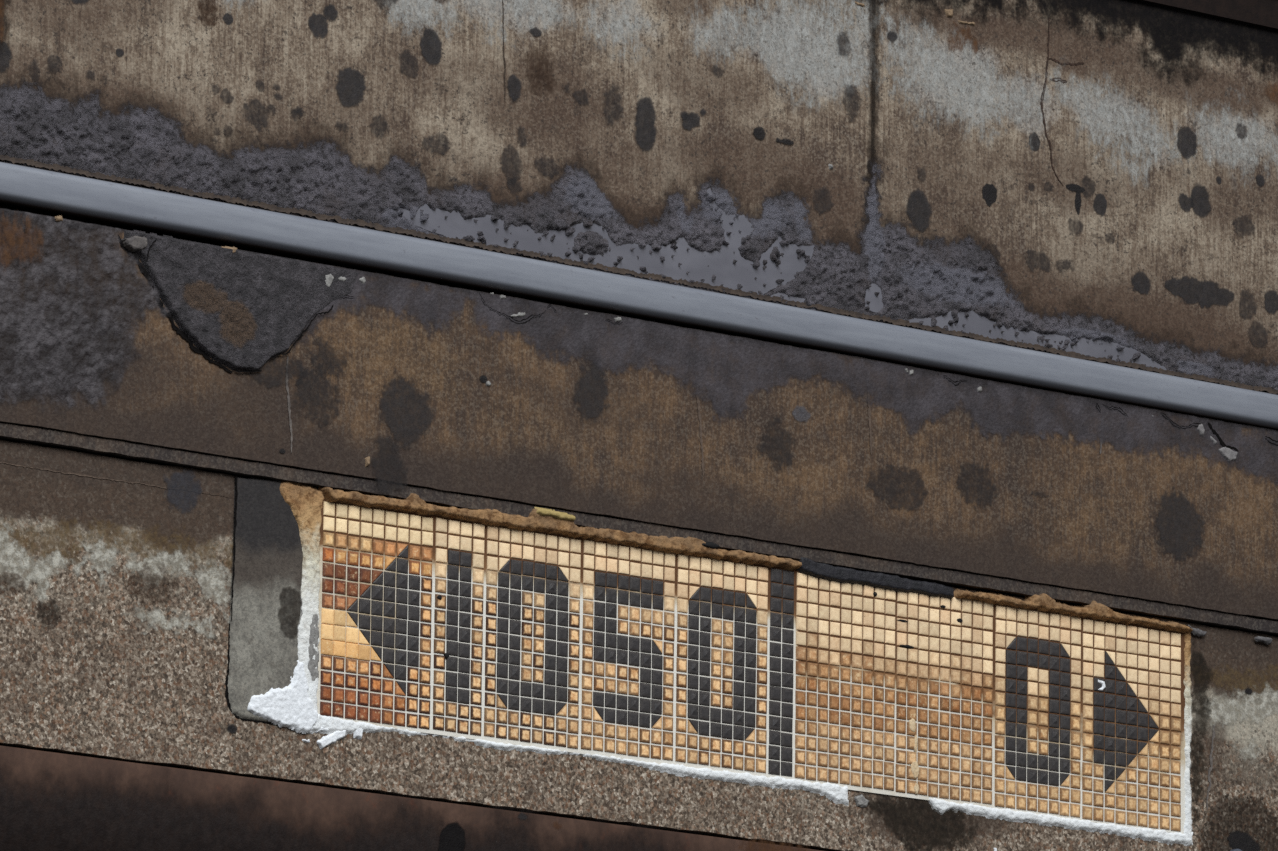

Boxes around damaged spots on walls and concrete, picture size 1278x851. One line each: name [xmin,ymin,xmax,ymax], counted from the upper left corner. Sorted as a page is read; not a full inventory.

crack [500,0,508,96]
spalling [753,127,794,145]
water stain [694,0,1042,132]
crack [1040,17,1084,185]
water stain [1051,69,1179,180]
water stain [1198,107,1278,173]
spalling [121,236,147,252]
spalling [325,274,366,287]
water stain [285,356,293,453]
water stain [0,524,232,637]
water stain [1190,641,1278,851]